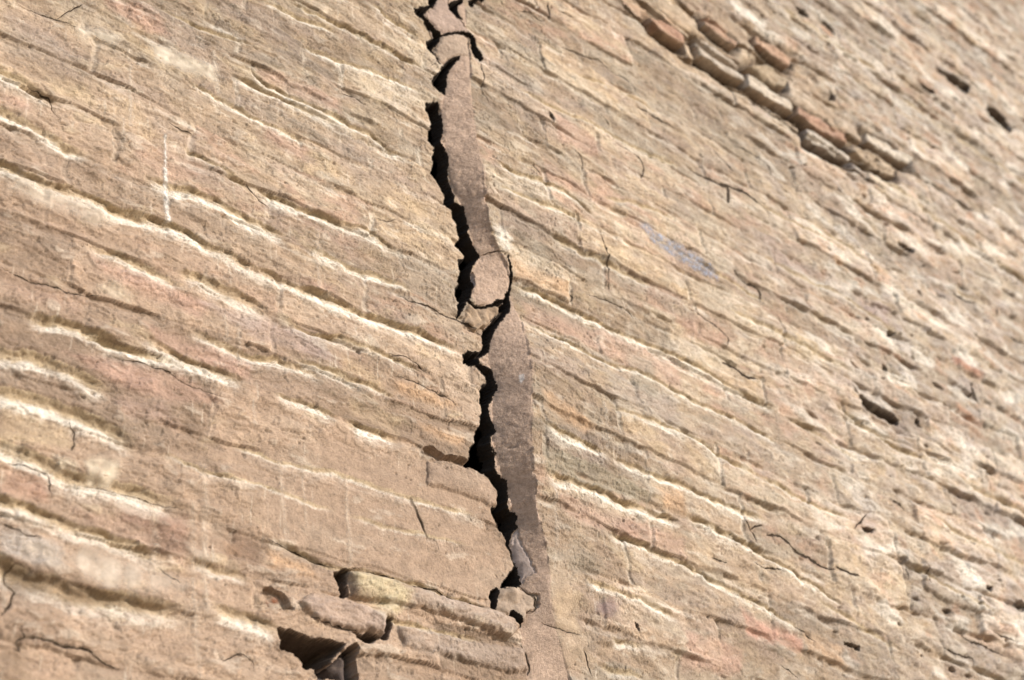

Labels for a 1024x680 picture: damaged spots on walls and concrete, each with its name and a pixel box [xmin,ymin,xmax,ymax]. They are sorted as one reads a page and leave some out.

spalling [623,0,913,183]
crack [271,0,593,677]
crack [745,520,859,576]
spalling [261,586,296,611]
spalling [313,642,361,680]